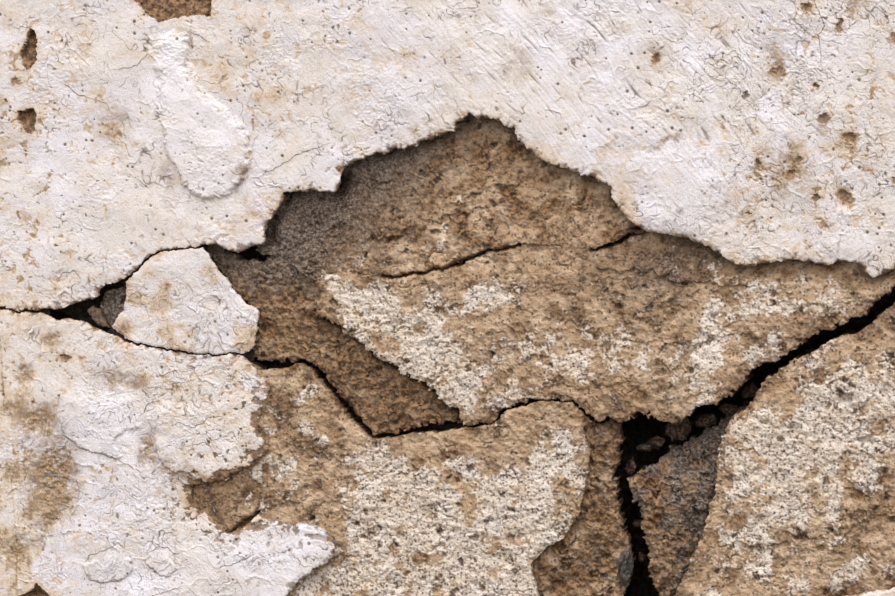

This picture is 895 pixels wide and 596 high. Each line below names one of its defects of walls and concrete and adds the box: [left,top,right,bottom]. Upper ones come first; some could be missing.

spalling [133,0,212,23]
spalling [10,28,37,86]
crack [596,233,631,250]
spalling [57,112,895,596]
crack [0,244,895,596]
spalling [20,583,50,596]